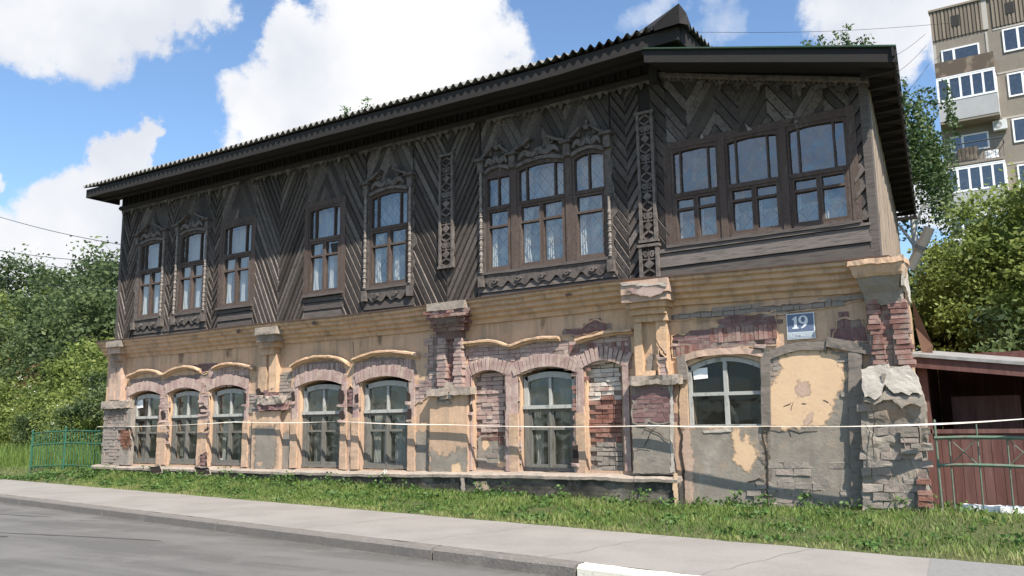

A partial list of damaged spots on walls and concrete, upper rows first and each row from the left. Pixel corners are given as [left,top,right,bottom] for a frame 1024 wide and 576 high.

spalling [101,408,132,466]
spalling [130,334,468,472]
spalling [465,318,634,472]
crack [618,376,686,504]
spalling [631,294,933,509]